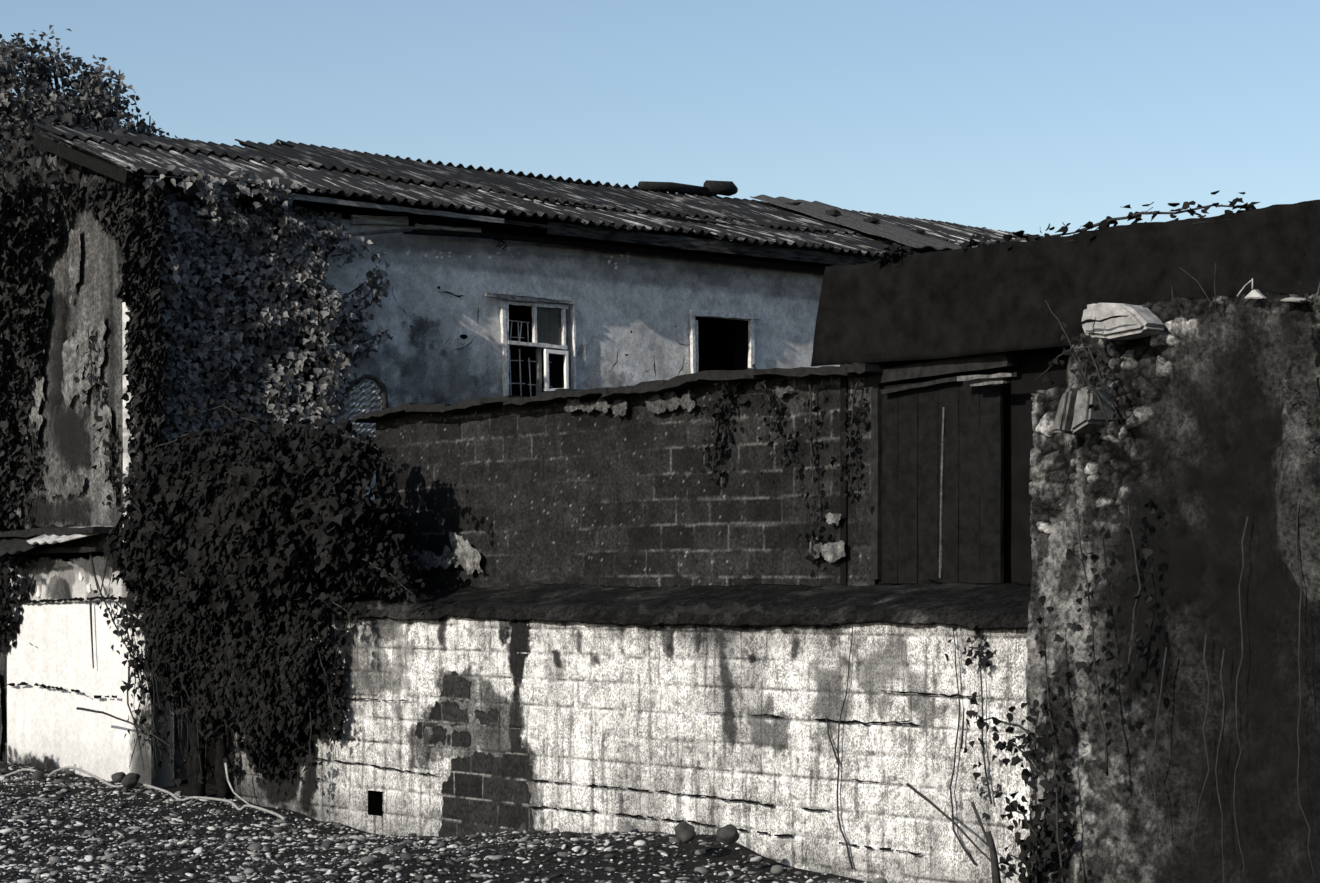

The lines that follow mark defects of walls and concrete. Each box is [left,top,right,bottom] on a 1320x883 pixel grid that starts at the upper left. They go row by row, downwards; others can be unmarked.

peeling [5,306,48,523]
peeling [67,228,81,304]
peeling [45,315,116,507]
damp [356,314,502,406]
damp [408,605,539,830]
damp [616,603,831,750]